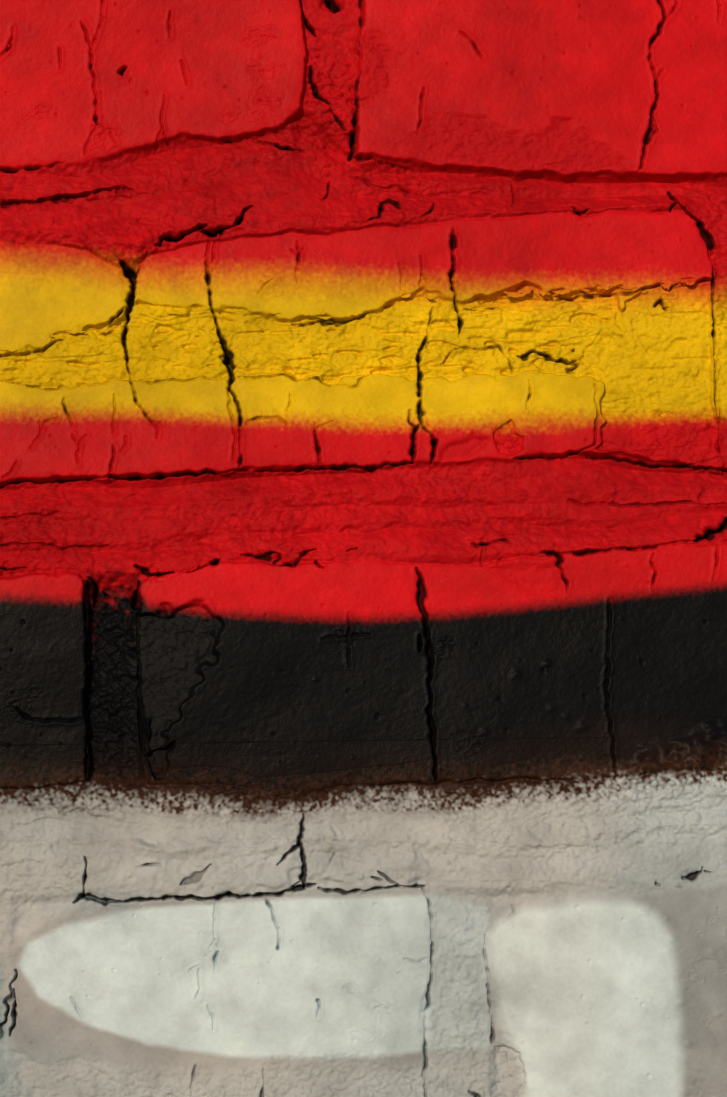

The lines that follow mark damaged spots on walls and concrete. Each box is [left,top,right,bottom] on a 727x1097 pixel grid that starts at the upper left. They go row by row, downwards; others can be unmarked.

crack [417,87,425,132]
crack [459,30,484,59]
crack [636,0,679,175]
crack [0,241,378,483]
crack [348,152,532,466]
spalling [121,597,225,759]
crack [415,567,438,781]
crack [136,861,163,869]